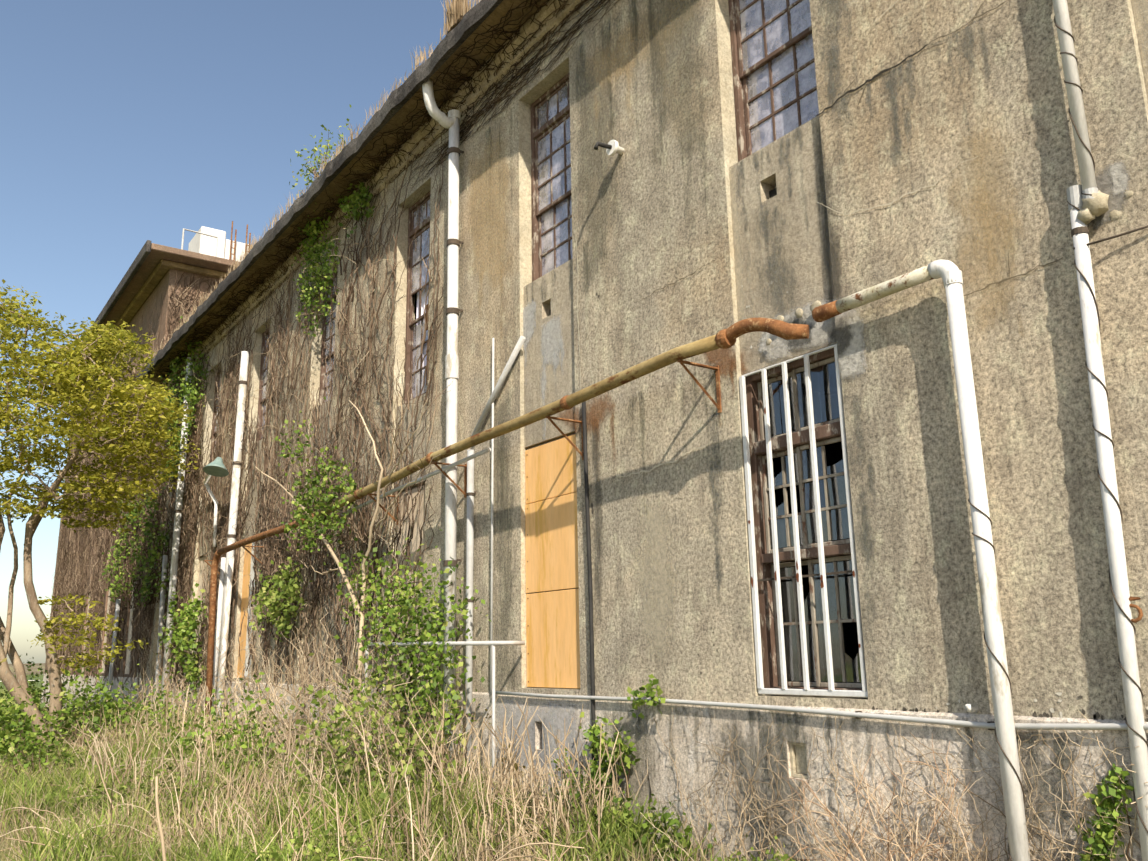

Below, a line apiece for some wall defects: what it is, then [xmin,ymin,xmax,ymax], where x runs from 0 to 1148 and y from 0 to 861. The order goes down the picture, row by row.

crack [815,0,1007,117]
water stain [722,713,800,861]
water stain [1017,730,1073,822]